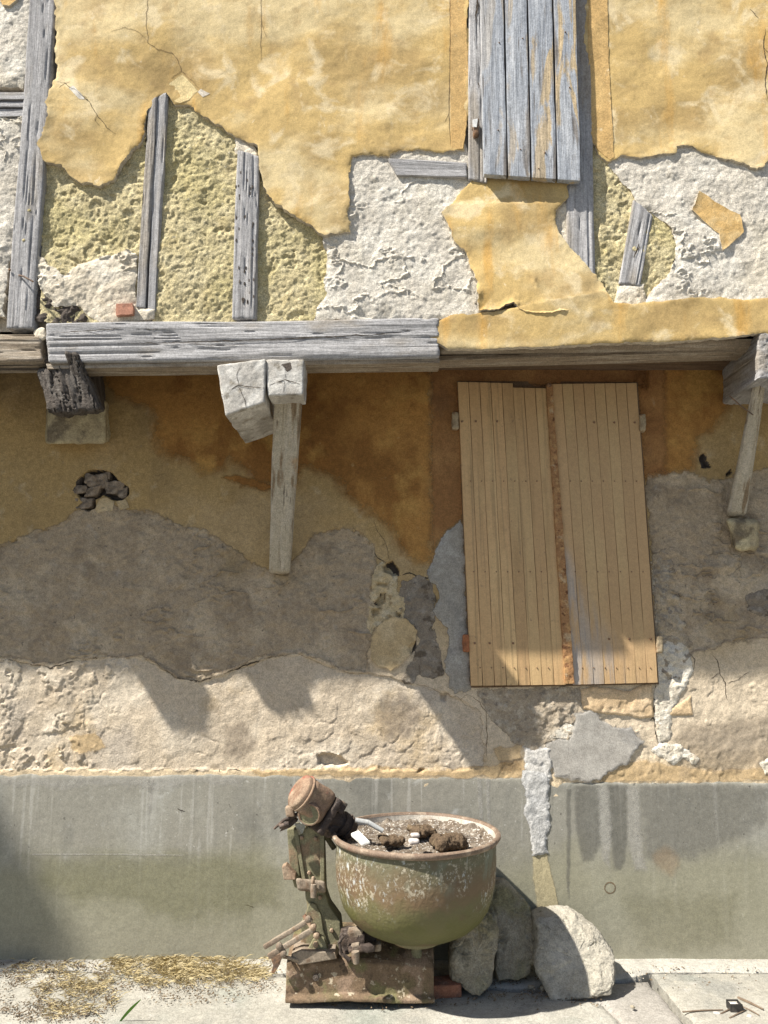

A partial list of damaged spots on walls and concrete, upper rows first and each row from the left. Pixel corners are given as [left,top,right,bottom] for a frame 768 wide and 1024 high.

crack [60,82,110,130]
flaking render [35,249,155,323]
flaking render [235,138,257,156]
flaking render [314,144,768,321]
flaking render [0,470,582,772]
flaking render [645,454,768,765]